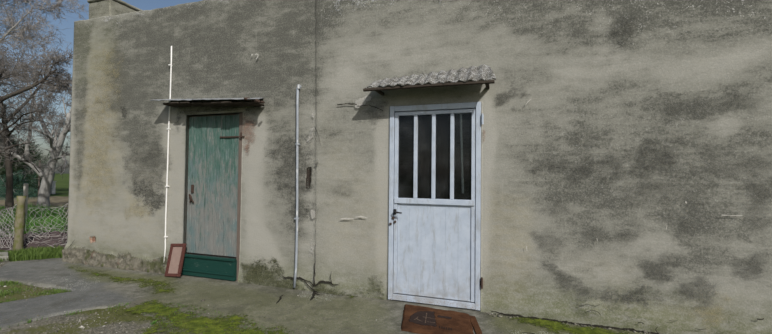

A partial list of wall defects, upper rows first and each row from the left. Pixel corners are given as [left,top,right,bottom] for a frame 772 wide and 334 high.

damp [242,259,299,290]
crack [491,311,671,334]